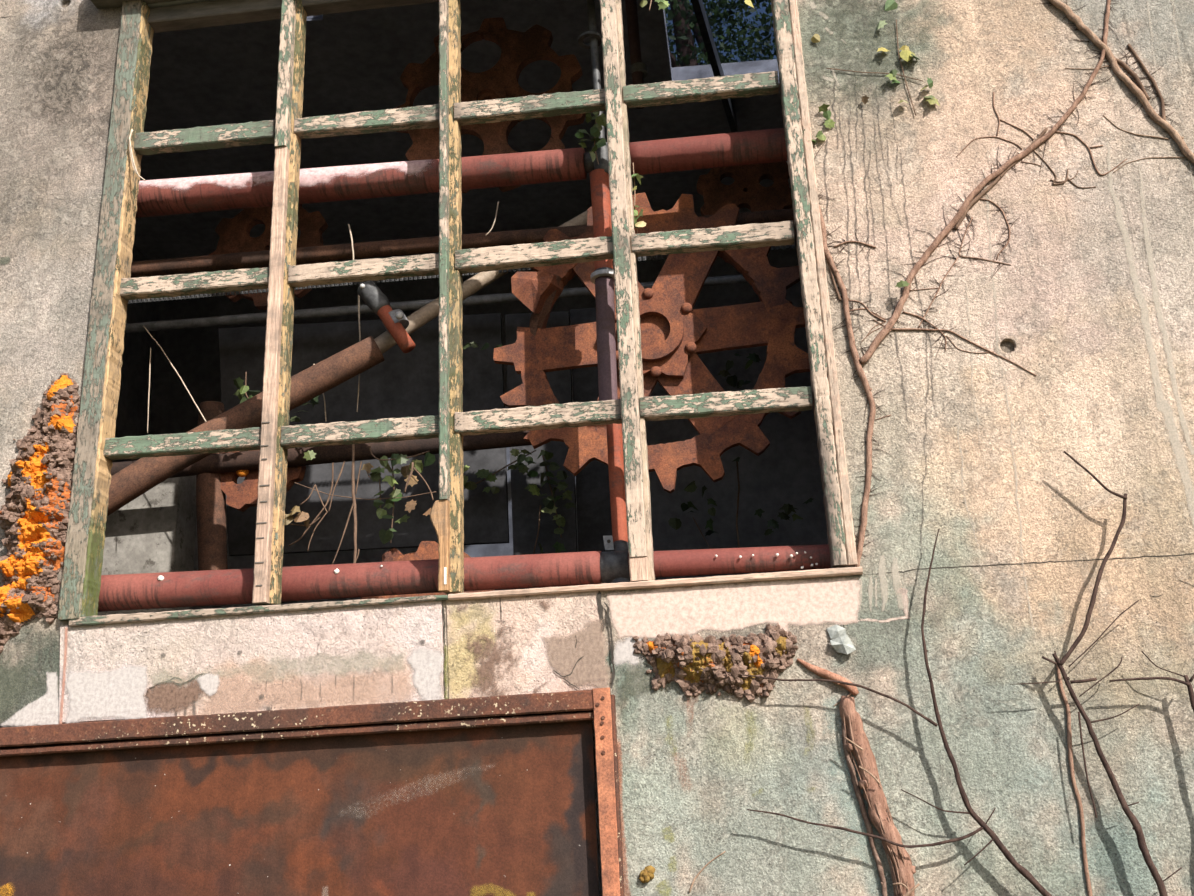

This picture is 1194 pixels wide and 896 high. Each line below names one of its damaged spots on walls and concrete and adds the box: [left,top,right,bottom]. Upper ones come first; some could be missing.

crack [853,553,1194,597]
peeling [543,578,910,688]
peeling [2,666,219,726]